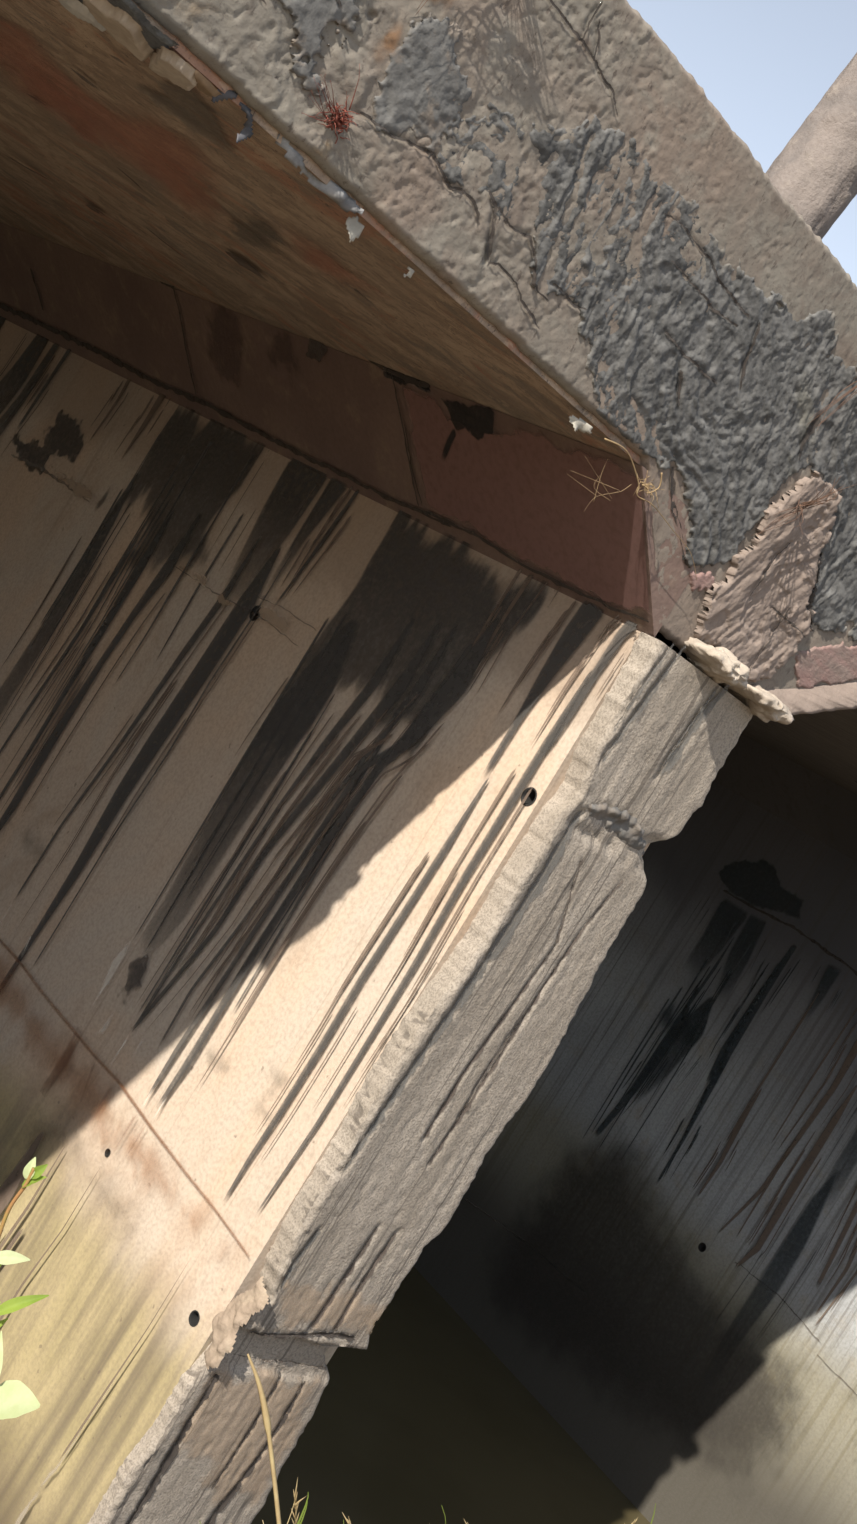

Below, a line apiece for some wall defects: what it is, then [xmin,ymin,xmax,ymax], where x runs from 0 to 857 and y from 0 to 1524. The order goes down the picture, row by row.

leakage [0,334,131,475]
flaking render [58,0,222,97]
leakage [0,393,359,992]
spalling [278,0,362,97]
crack [0,268,685,760]
leakage [100,510,637,1208]
leakage [383,368,494,458]
crack [360,112,586,329]
crack [343,811,623,1168]
spalling [372,12,857,641]
leakage [507,860,857,1448]
crack [660,543,823,774]